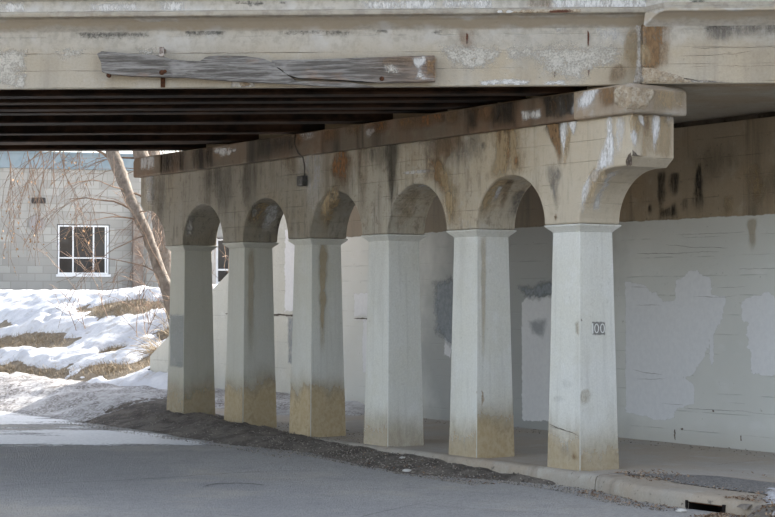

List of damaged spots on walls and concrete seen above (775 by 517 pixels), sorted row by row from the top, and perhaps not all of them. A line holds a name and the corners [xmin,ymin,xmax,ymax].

peeling [442,45,499,69]
peeling [509,43,620,85]
spalling [613,25,733,110]
damp [494,87,614,158]
damp [582,91,682,207]
damp [658,174,678,216]